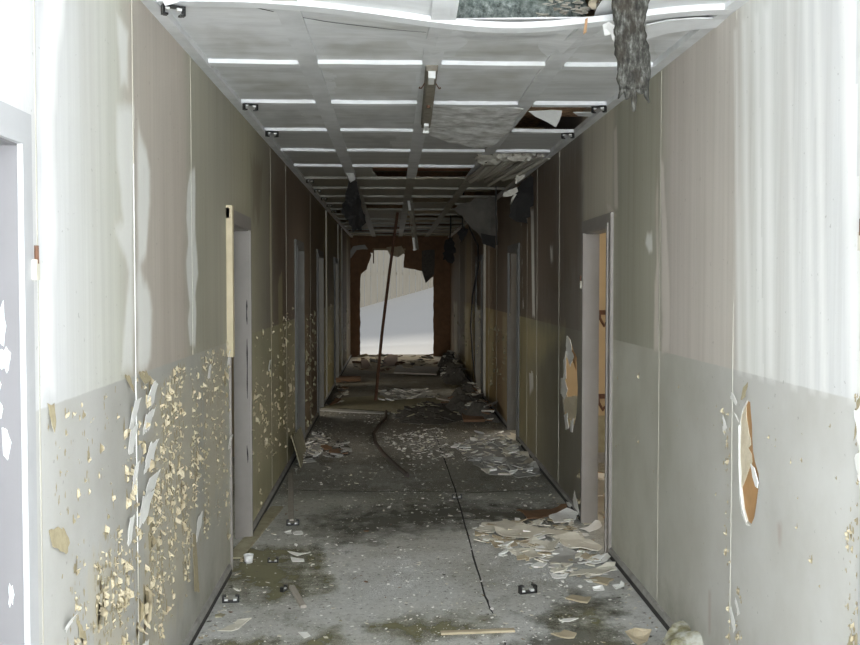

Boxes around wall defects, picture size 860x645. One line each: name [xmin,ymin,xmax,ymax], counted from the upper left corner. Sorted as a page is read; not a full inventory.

peeling [0,302,11,373]
peeling [0,403,11,460]
peeling [47,333,233,645]
peeling [252,307,317,512]
spalling [561,336,577,432]
spalling [713,382,759,526]
damp [229,502,632,645]
peeling [840,503,859,645]